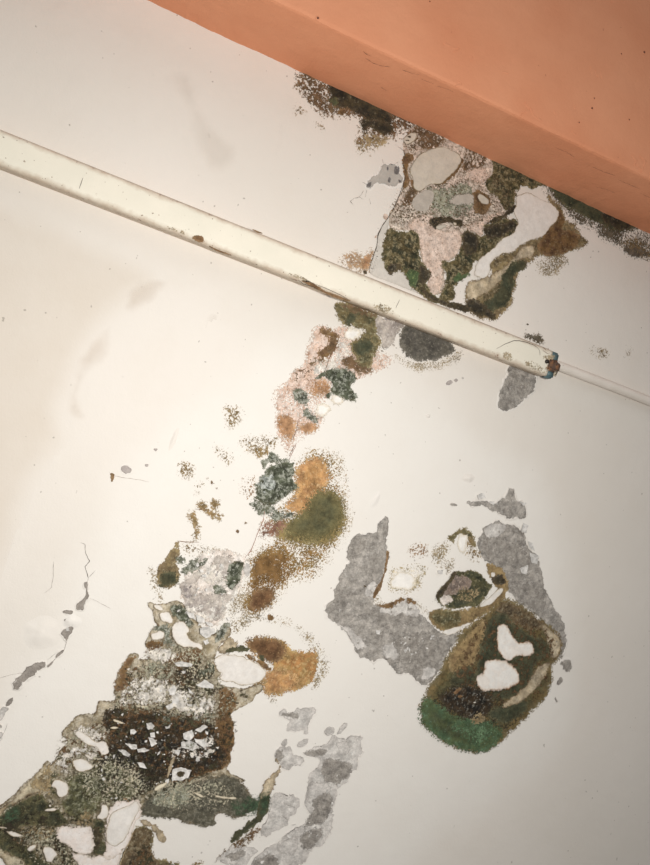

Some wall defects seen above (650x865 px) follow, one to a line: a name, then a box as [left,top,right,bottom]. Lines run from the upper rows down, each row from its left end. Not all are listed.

mould [293,72,414,155]
flaking render [365,125,588,322]
mould [543,185,650,262]
flaking render [496,365,538,413]
leakage [0,178,613,865]
flaking render [323,516,462,687]
flaking render [449,487,573,686]
peeling [216,706,365,865]